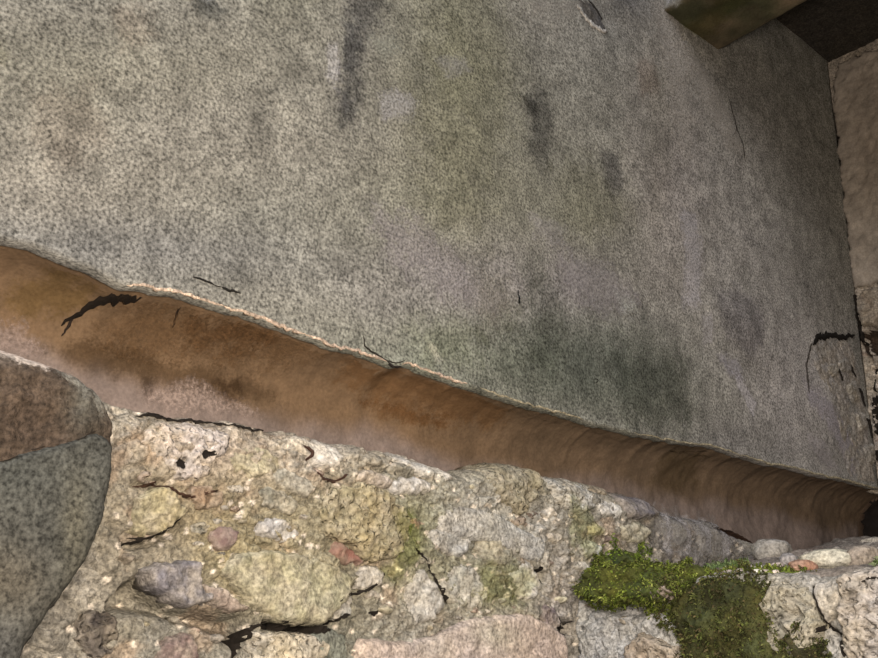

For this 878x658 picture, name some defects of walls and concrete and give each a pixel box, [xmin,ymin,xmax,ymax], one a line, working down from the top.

spalling [577,0,607,33]
leakage [327,45,338,79]
crack [193,277,241,294]
crack [61,293,142,336]